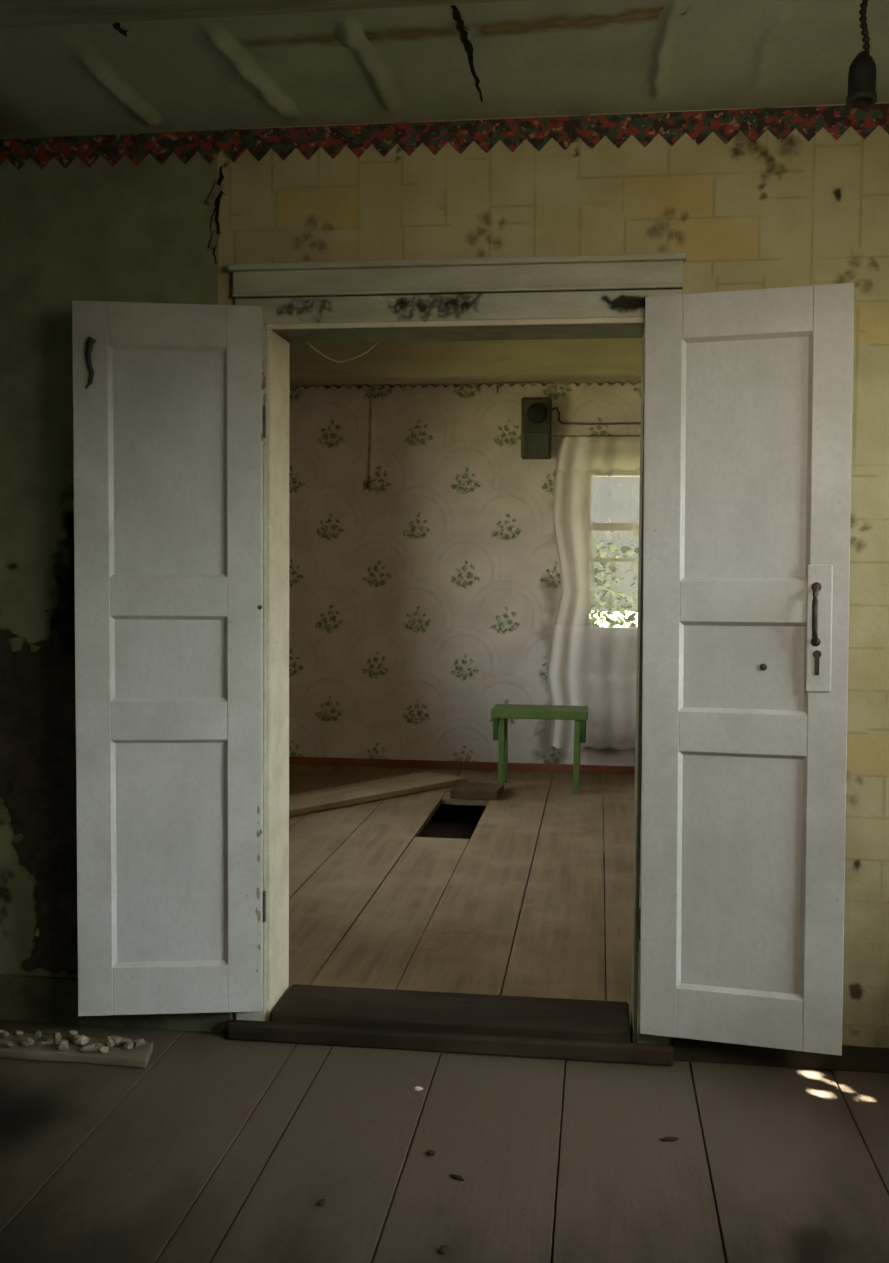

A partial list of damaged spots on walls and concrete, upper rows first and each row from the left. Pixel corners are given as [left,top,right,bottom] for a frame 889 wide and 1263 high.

crack [450,5,483,102]
peeling [50,855,77,893]